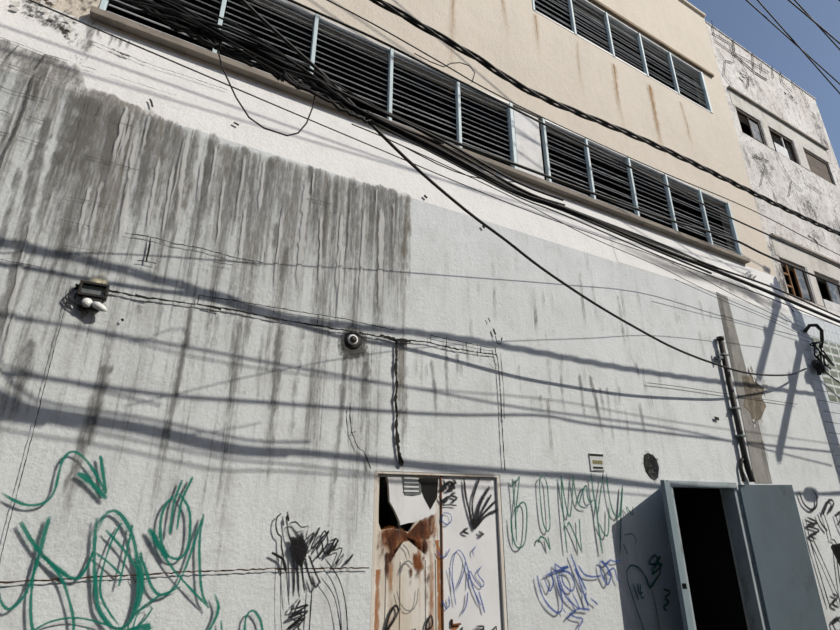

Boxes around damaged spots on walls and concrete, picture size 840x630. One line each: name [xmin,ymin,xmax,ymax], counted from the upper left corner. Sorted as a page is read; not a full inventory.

water stain [0,37,411,448]
water stain [65,355,113,489]
crack [109,290,505,469]
peeling [716,292,772,483]
corrosion [374,515,442,630]